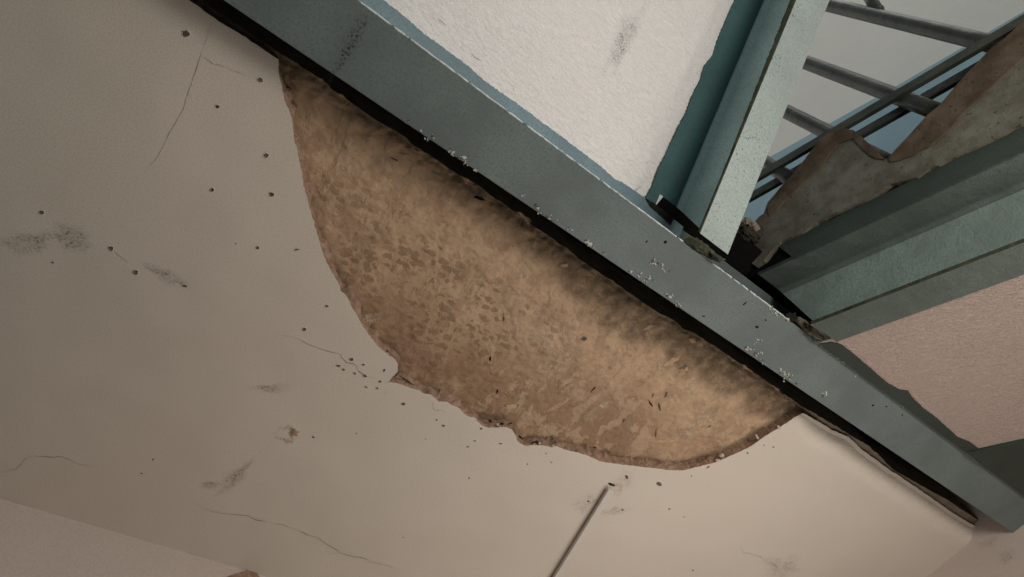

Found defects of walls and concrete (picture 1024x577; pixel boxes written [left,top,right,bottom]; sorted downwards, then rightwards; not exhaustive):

spalling [251,36,804,486]